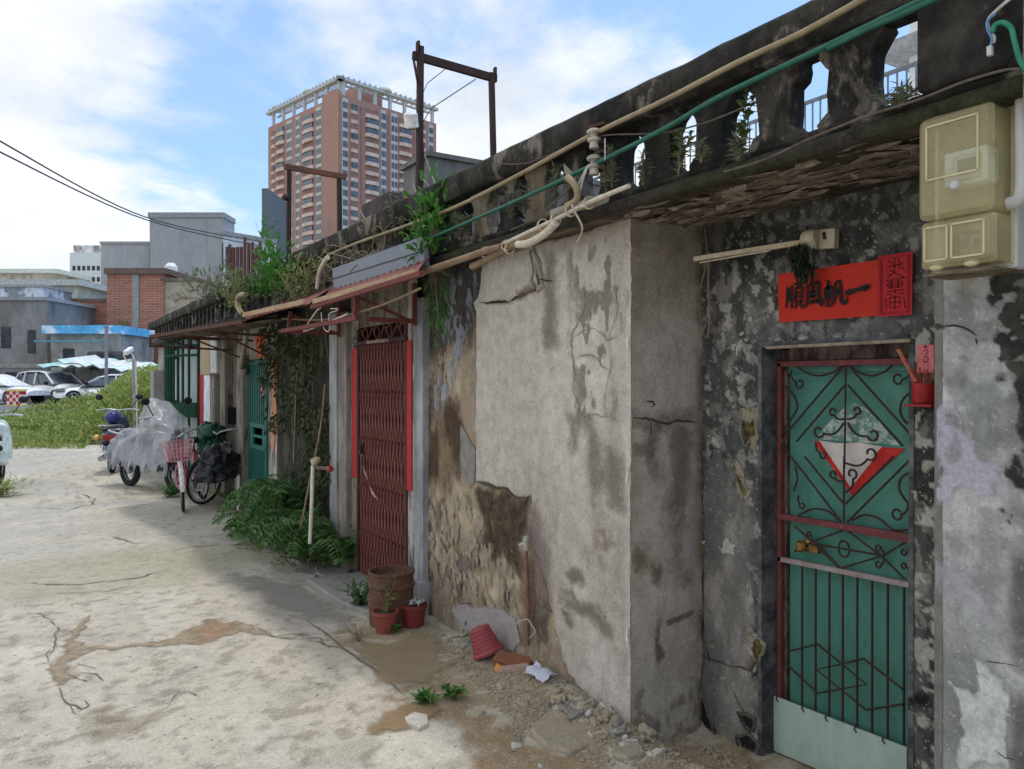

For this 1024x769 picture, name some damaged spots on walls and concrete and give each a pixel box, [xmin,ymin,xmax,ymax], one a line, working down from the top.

peeling [618,132,935,231]
crack [479,245,552,304]
damp [518,253,555,346]
damp [428,272,477,475]
damp [570,256,621,506]
crack [633,401,696,435]
spalling [475,481,529,502]
peeling [428,491,514,608]
crack [46,586,126,681]
crack [278,618,402,693]
damp [562,569,610,634]
spalling [734,711,763,756]